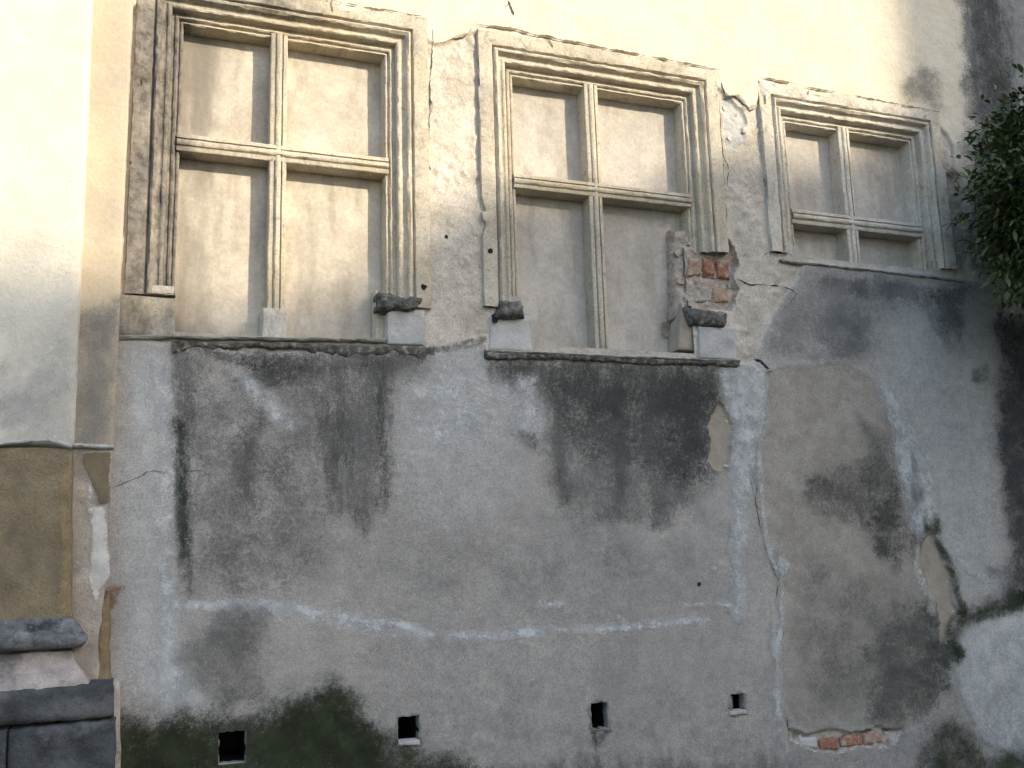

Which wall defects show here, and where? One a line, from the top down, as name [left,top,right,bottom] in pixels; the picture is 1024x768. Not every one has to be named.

crack [331,0,938,215]
spalling [673,239,740,311]
peeling [0,438,114,603]
damp [132,352,739,707]
spalling [706,401,734,476]
crack [749,359,784,644]
damp [757,455,791,754]
damp [877,379,939,534]
spalling [915,533,961,646]
spalling [788,725,903,754]